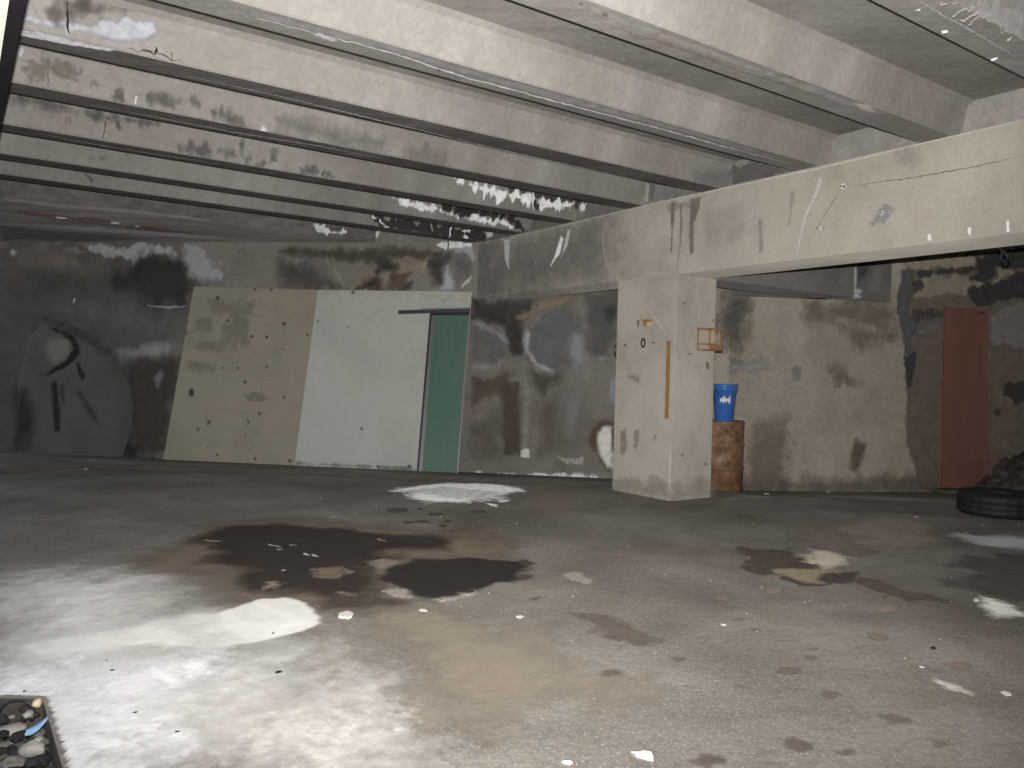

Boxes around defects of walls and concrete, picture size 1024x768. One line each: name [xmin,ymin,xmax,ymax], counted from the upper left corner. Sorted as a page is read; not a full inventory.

leakage [15,14,157,58]
leakage [203,18,1024,291]
leakage [2,197,210,222]
crack [818,156,1020,225]
leakage [0,225,260,282]
leakage [913,248,1024,307]
leakage [471,287,666,458]
leakage [904,353,915,387]
leakage [528,456,598,478]
leakage [698,755,724,764]
leakage [786,739,812,750]